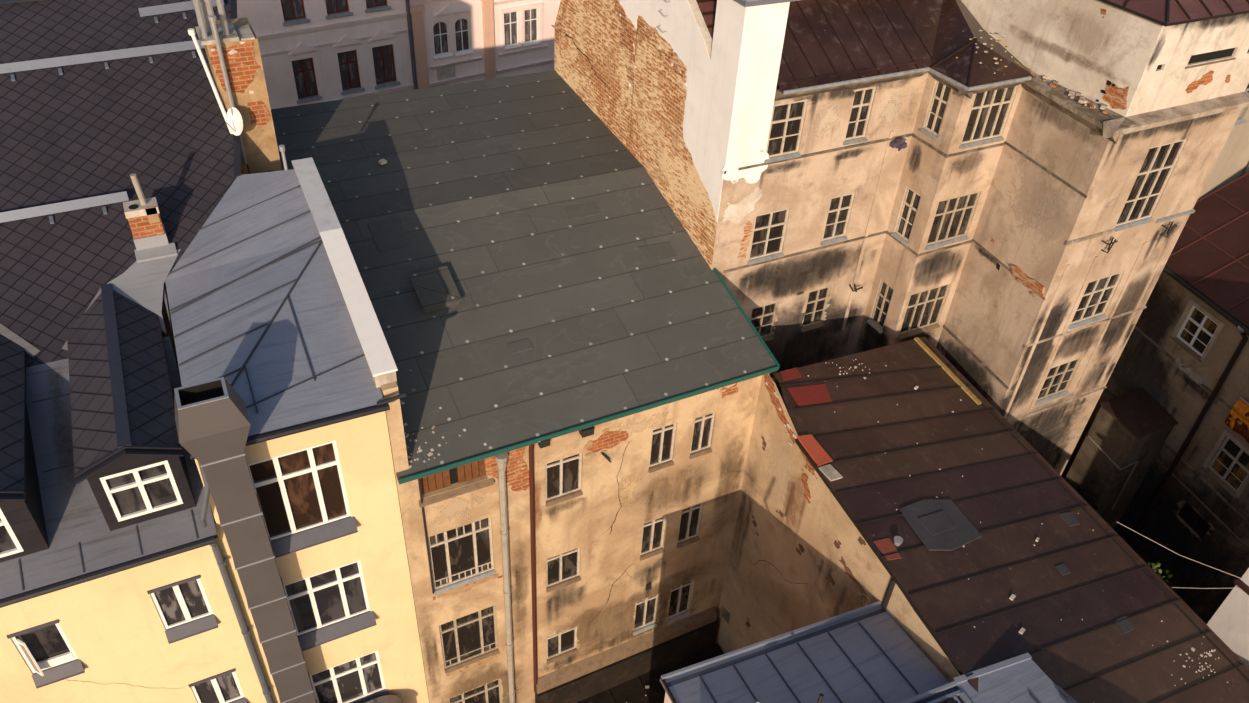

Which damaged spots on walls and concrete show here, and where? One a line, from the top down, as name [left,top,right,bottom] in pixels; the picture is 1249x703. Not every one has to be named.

flaking render [554,0,569,64]
flaking render [612,0,687,87]
flaking render [1096,80,1130,110]
flaking render [1185,70,1231,93]
peeling [722,150,770,259]
flaking render [996,263,1045,297]
flaking render [484,447,529,492]
flaking render [585,428,629,456]
crack [599,442,630,537]
flaking render [764,374,817,503]
flaking render [826,540,869,605]
leakage [573,576,687,649]